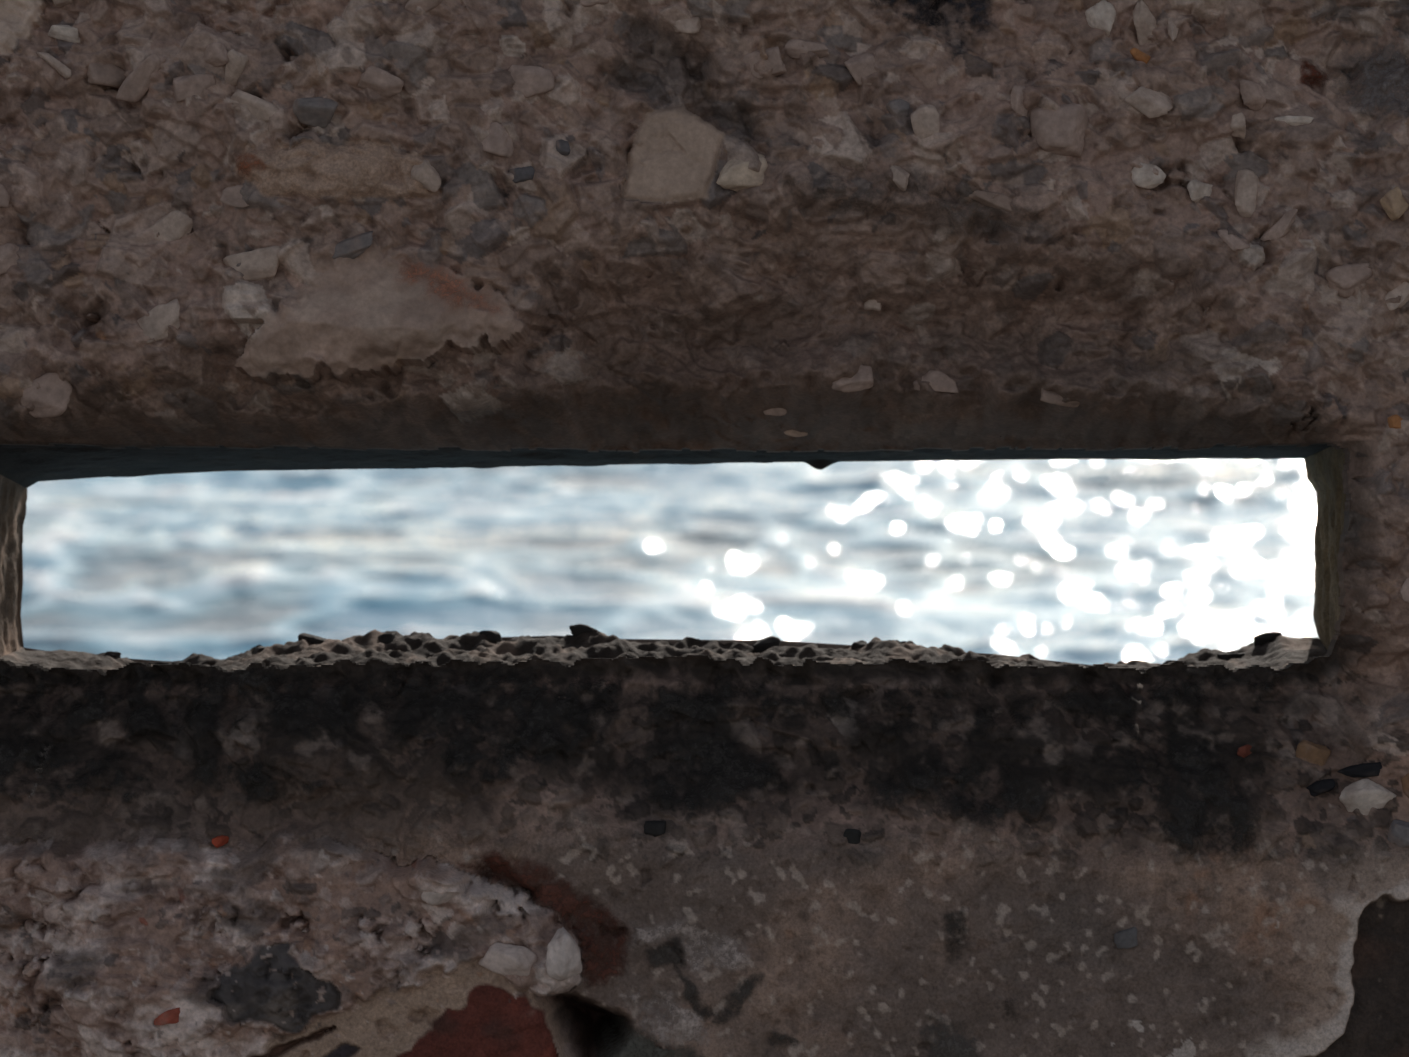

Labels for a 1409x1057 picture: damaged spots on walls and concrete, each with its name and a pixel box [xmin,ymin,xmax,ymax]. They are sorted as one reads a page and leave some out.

crack [525,988,635,1057]
peeling [1245,879,1409,1057]